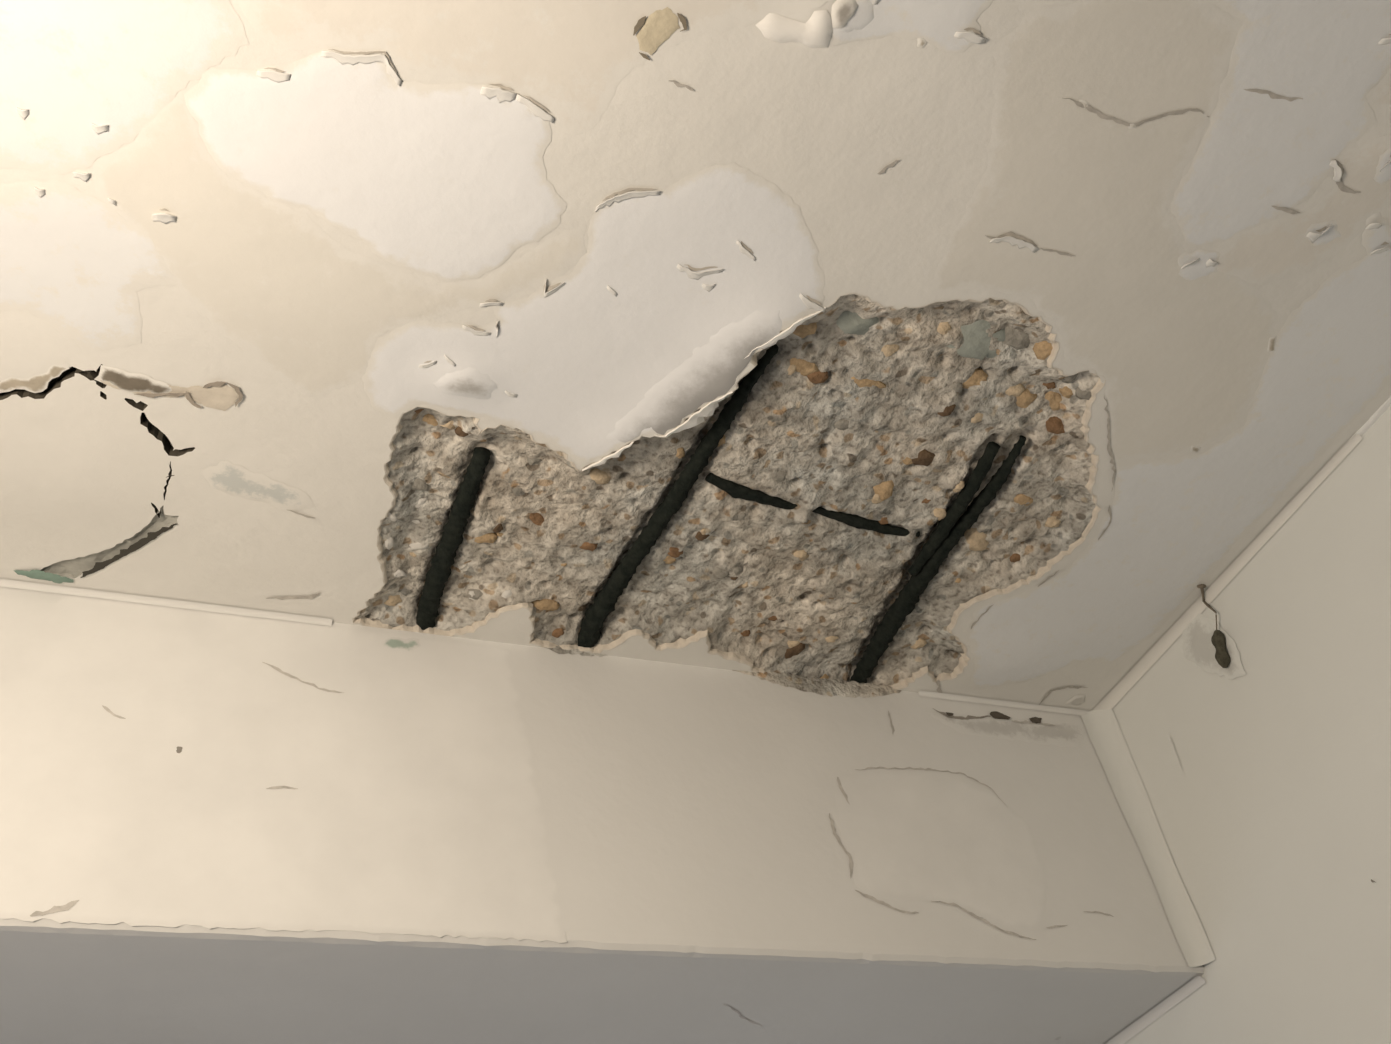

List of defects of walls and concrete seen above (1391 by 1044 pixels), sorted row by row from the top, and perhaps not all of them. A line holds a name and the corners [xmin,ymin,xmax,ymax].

crack [1063,98,1209,129]
spalling [0,0,1391,698]
crack [0,364,195,518]
damp [199,460,317,512]
damp [1182,613,1246,680]